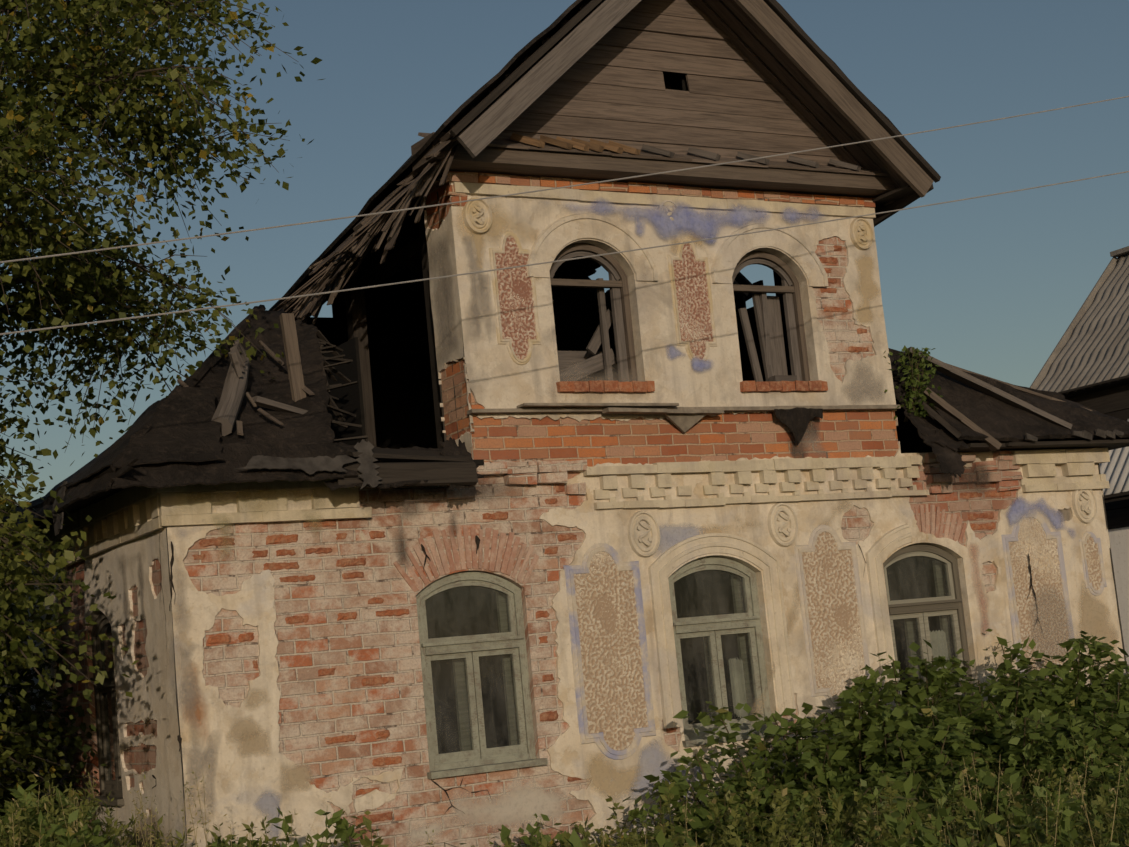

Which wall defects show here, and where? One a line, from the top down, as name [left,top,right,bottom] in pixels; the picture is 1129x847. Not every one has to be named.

spalling [812,236,875,382]
spalling [907,451,1023,546]
spalling [152,559,162,596]
spalling [183,359,899,847]
crack [1027,554,1045,639]
spalling [15,560,157,830]